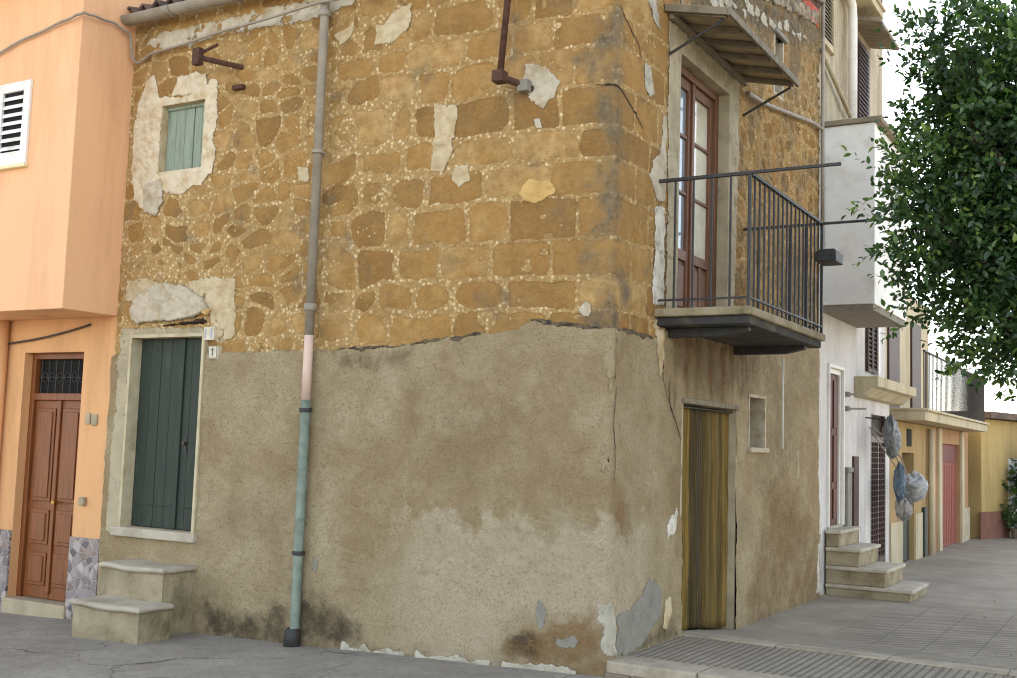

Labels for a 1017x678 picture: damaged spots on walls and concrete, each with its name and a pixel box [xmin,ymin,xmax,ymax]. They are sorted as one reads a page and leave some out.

crack [596,83,643,128]
crack [663,369,681,439]
leakage [209,607,283,637]
leakage [300,602,351,641]
flaking render [556,635,579,649]
peeling [596,577,672,658]